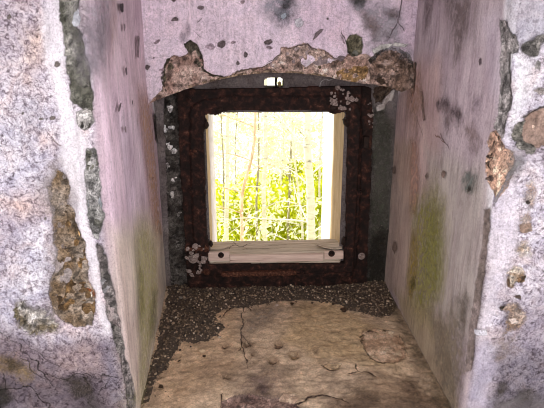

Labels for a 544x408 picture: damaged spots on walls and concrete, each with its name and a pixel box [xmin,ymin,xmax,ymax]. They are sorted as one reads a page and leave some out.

spalling [13,169,96,335]
crack [220,306,251,368]
spalling [150,29,395,286]
spalling [465,20,544,372]